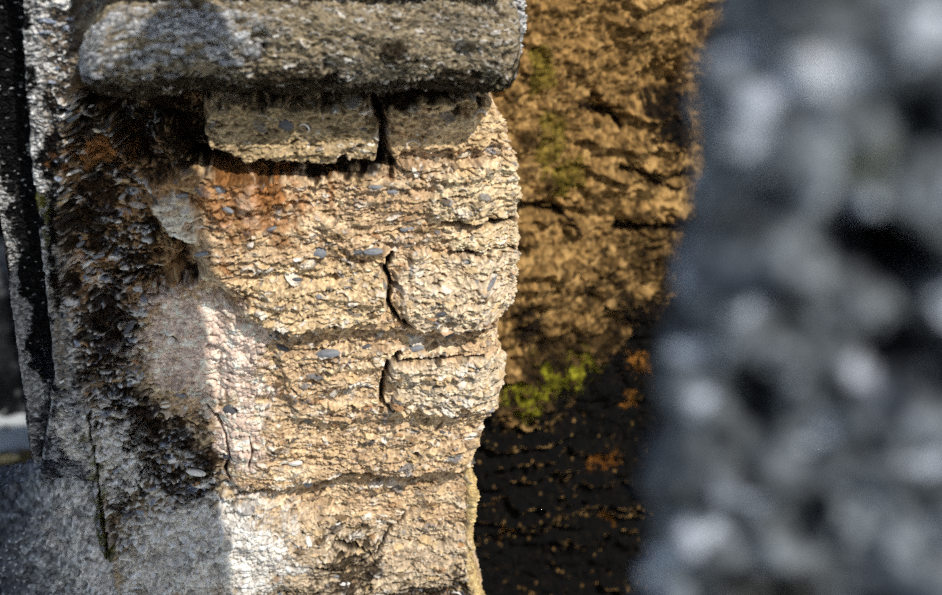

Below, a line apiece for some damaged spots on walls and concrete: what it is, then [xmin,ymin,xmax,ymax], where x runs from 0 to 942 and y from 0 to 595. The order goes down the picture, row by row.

crack [371,93,395,172]
damp [0,0,521,595]
crack [382,251,406,323]
crack [379,350,441,412]